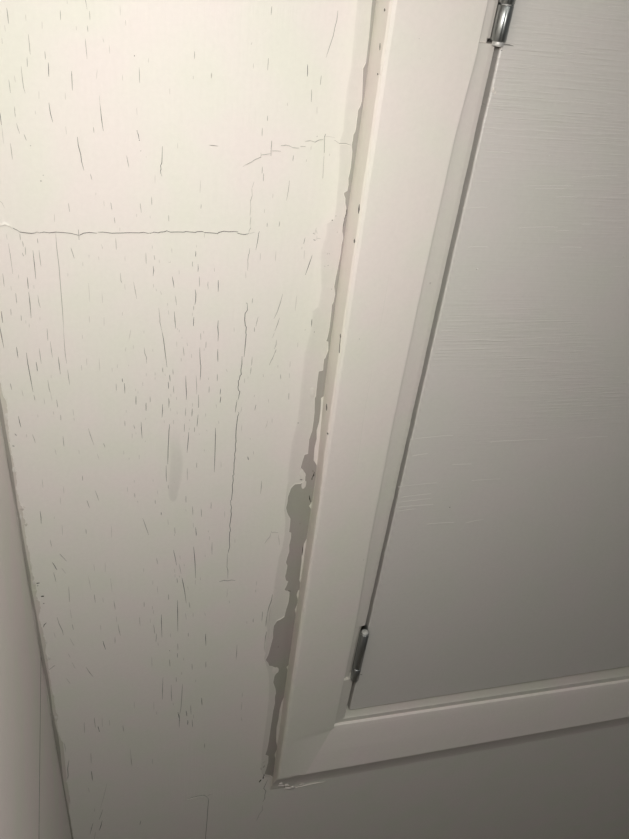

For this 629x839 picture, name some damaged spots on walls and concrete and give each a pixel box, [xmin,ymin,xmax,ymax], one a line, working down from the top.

crack [0,12,49,160]
crack [35,75,103,179]
crack [0,134,351,727]
peeling [260,0,385,778]